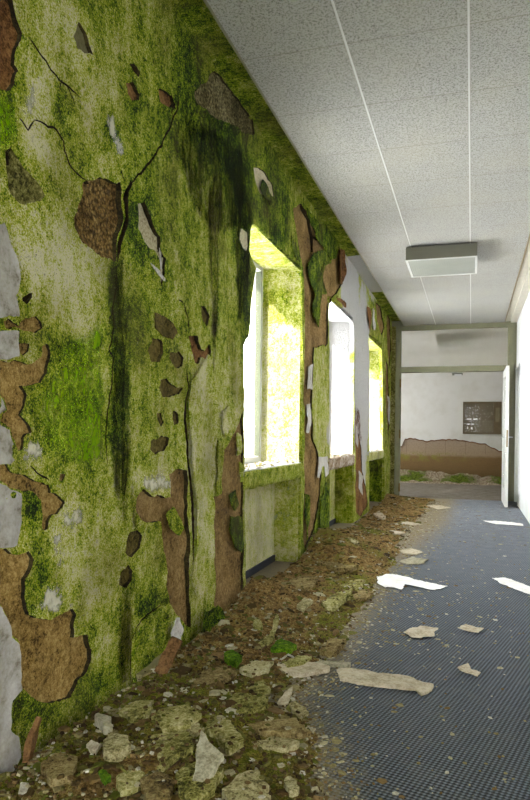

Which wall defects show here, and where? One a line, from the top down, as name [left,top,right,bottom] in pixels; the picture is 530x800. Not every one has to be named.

spalling [0,0,22,91]
crack [28,37,81,105]
spalling [4,149,45,205]
crack [19,118,89,184]
spalling [74,177,123,262]
damp [112,261,130,500]
spalling [290,204,347,549]
spalling [0,223,92,774]
crack [184,373,195,565]
peeling [136,335,244,640]
spalling [355,419,368,517]
spalling [400,438,502,477]